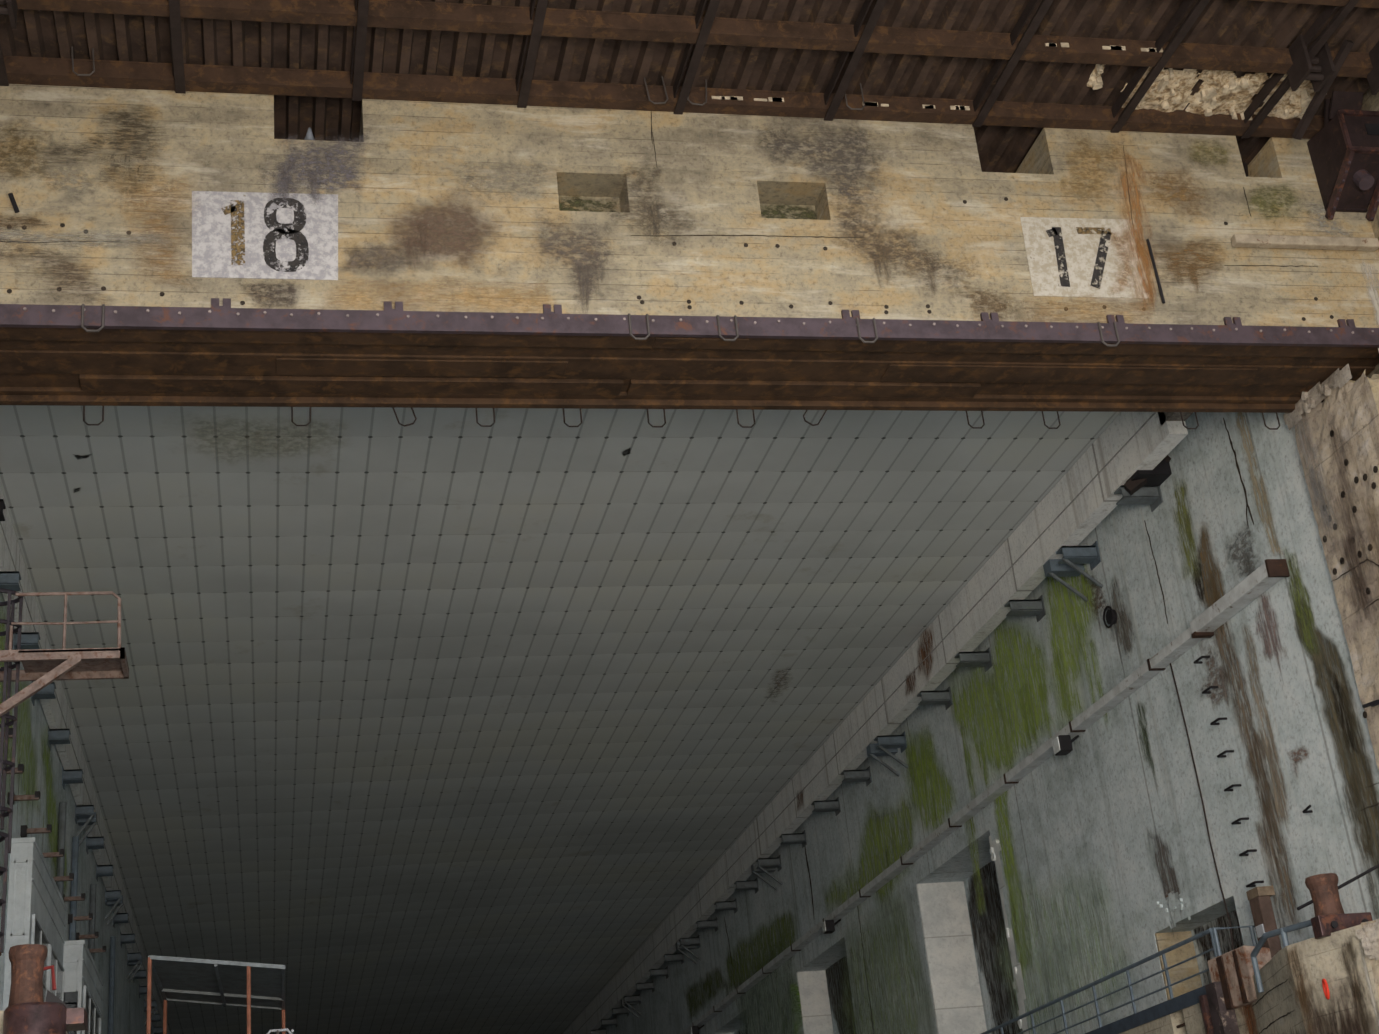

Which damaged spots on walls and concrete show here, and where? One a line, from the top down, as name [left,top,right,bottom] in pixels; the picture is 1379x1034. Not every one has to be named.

peeling [1087,64,1105,90]
peeling [1120,67,1316,120]
water stain [0,110,156,198]
water stain [541,223,609,300]
water stain [761,128,962,288]
corrosion [1074,142,1217,297]
spalling [1283,364,1352,430]
water stain [1185,520,1225,608]
water stain [1215,622,1299,927]
water stain [1294,580,1379,917]
water stain [1288,942,1379,1034]